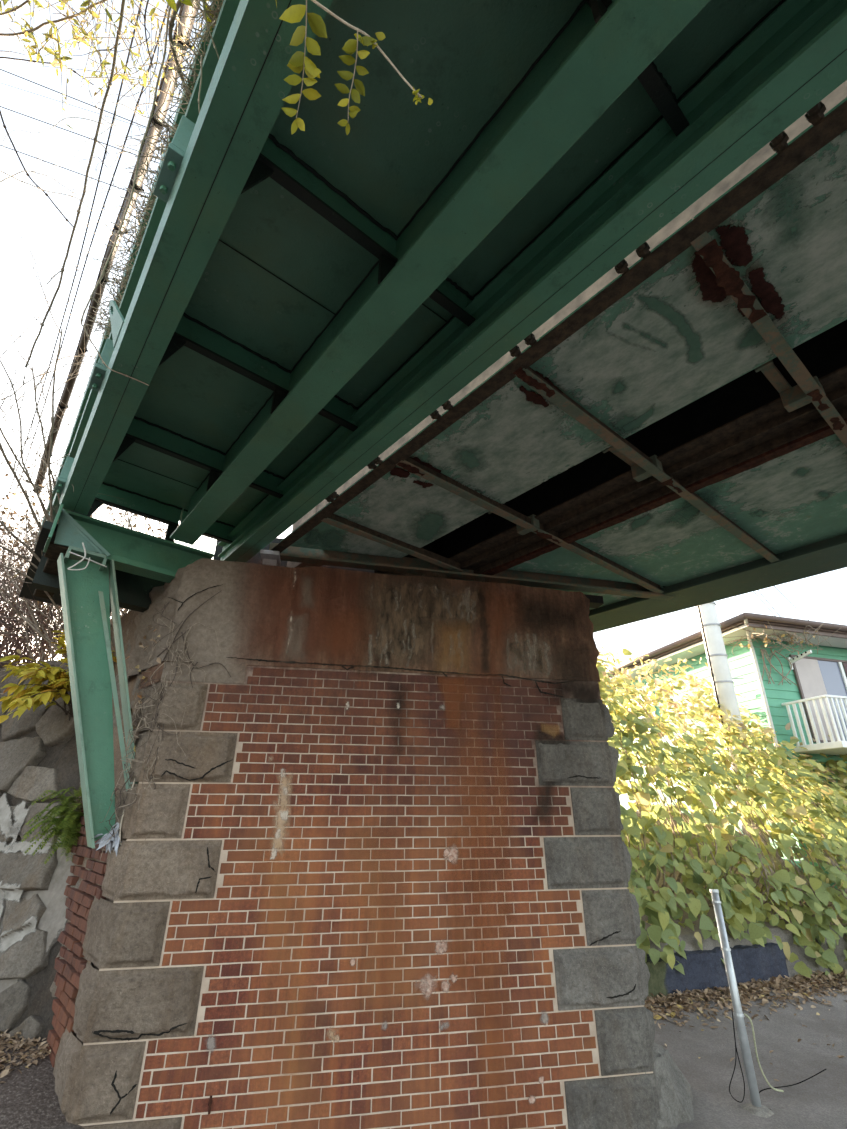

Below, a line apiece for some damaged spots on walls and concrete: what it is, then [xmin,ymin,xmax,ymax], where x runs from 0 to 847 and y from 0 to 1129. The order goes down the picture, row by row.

rust [692,225,785,324]
rust [513,367,563,407]
peeling [305,254,774,558]
rust [390,457,441,488]
peeling [582,439,847,560]
crack [161,759,233,781]
crack [195,847,215,893]
crack [589,931,620,946]
spalling [419,974,457,997]
crack [607,984,636,999]
crack [92,1023,187,1041]
crack [110,1070,137,1115]